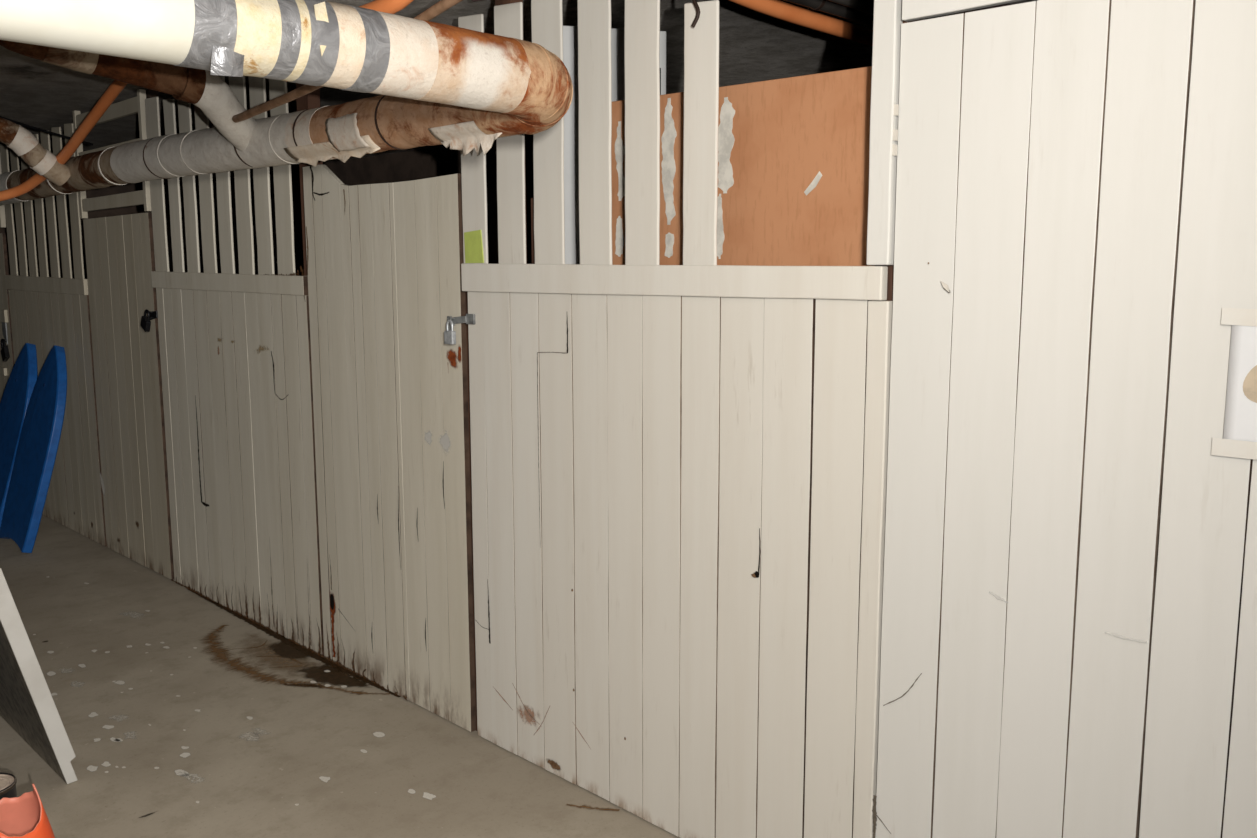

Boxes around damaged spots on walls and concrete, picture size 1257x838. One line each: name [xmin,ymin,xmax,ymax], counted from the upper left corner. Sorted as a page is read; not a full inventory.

rust [447,346,461,373]
leakage [171,557,407,700]